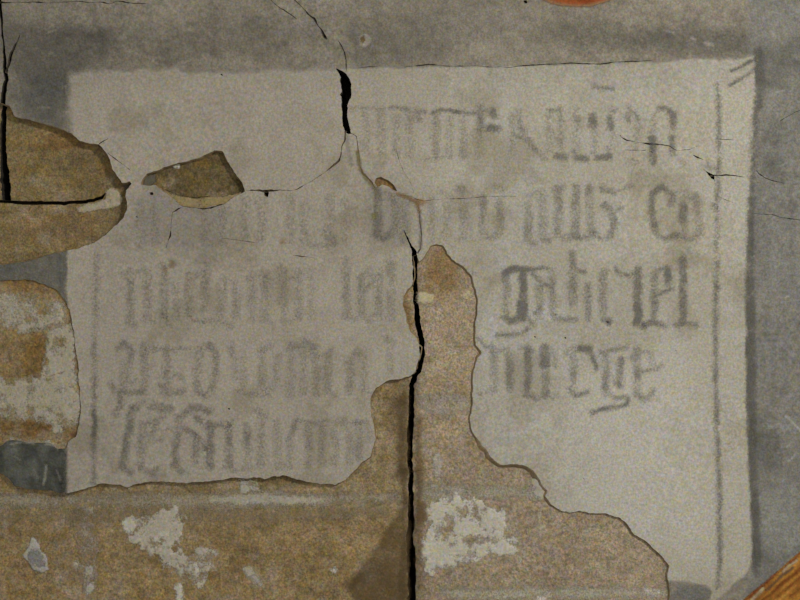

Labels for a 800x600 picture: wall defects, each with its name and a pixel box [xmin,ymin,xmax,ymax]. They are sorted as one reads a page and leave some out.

crack [0,0,20,202]
flaking render [0,103,131,265]
flaking render [141,150,245,210]
crack [246,0,376,197]
crack [407,60,652,68]
flaking render [0,244,670,600]